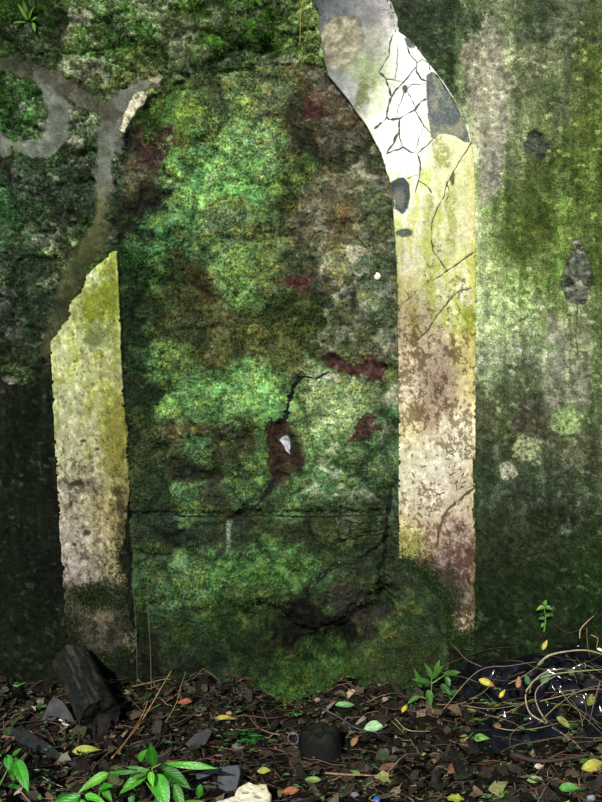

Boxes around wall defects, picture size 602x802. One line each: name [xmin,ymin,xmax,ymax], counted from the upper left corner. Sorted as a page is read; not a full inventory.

flaking render [426,8,512,212]
crack [374,35,475,280]
spalling [523,130,550,159]
spalling [391,177,410,214]
spalling [396,229,412,238]
spalling [560,238,595,305]
crack [417,288,471,341]
spalling [324,350,388,387]
crack [283,371,330,424]
spalling [347,412,382,444]